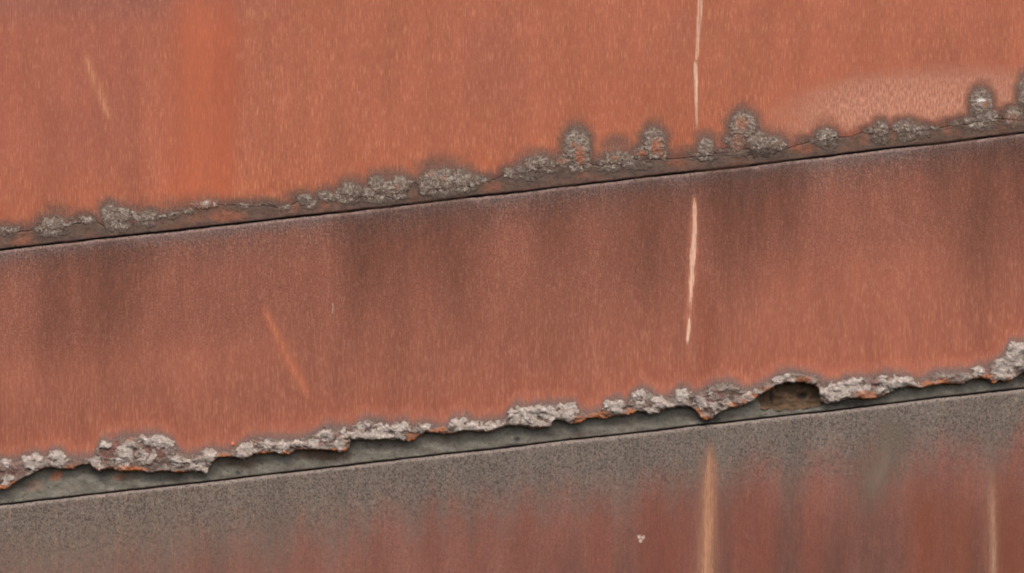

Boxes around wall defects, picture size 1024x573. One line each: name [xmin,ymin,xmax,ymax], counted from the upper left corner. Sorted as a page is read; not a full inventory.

corrosion [949,77,1024,133]
corrosion [555,126,592,174]
corrosion [621,126,669,171]
corrosion [687,109,773,164]
spalling [0,341,1024,490]
corrosion [701,454,714,573]
corrosion [988,485,997,573]